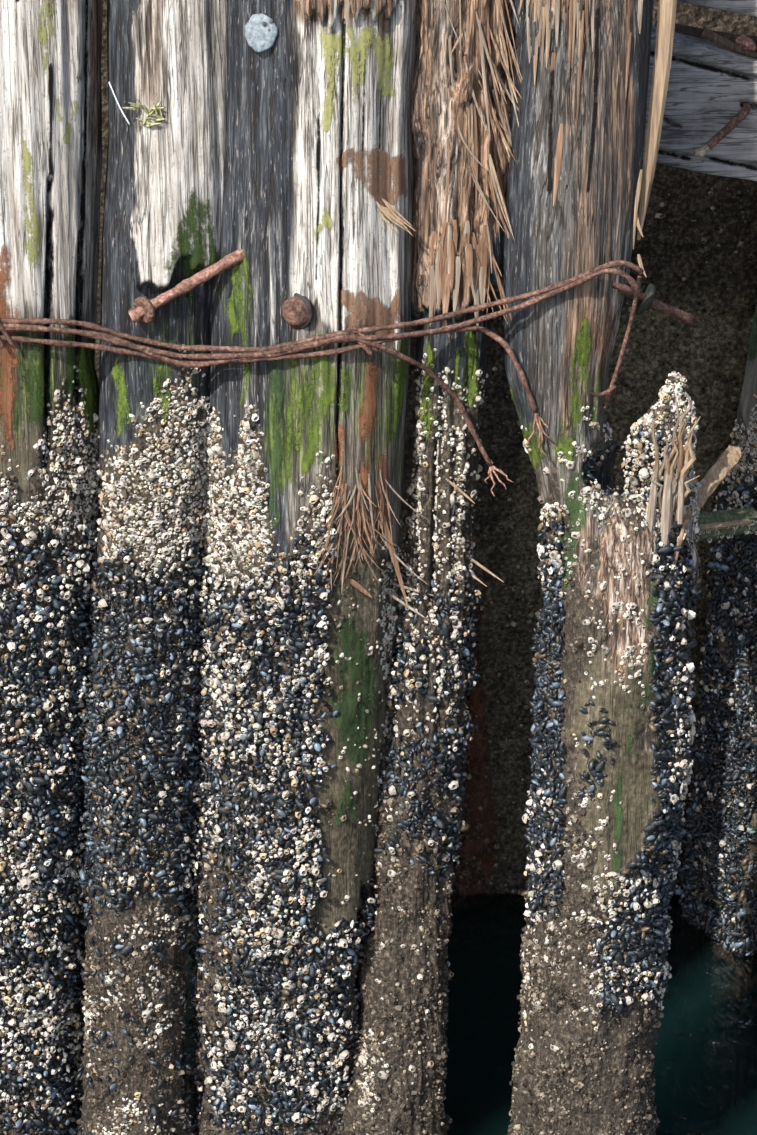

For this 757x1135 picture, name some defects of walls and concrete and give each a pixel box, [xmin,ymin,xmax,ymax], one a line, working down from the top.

corrosion [0,245,18,462]